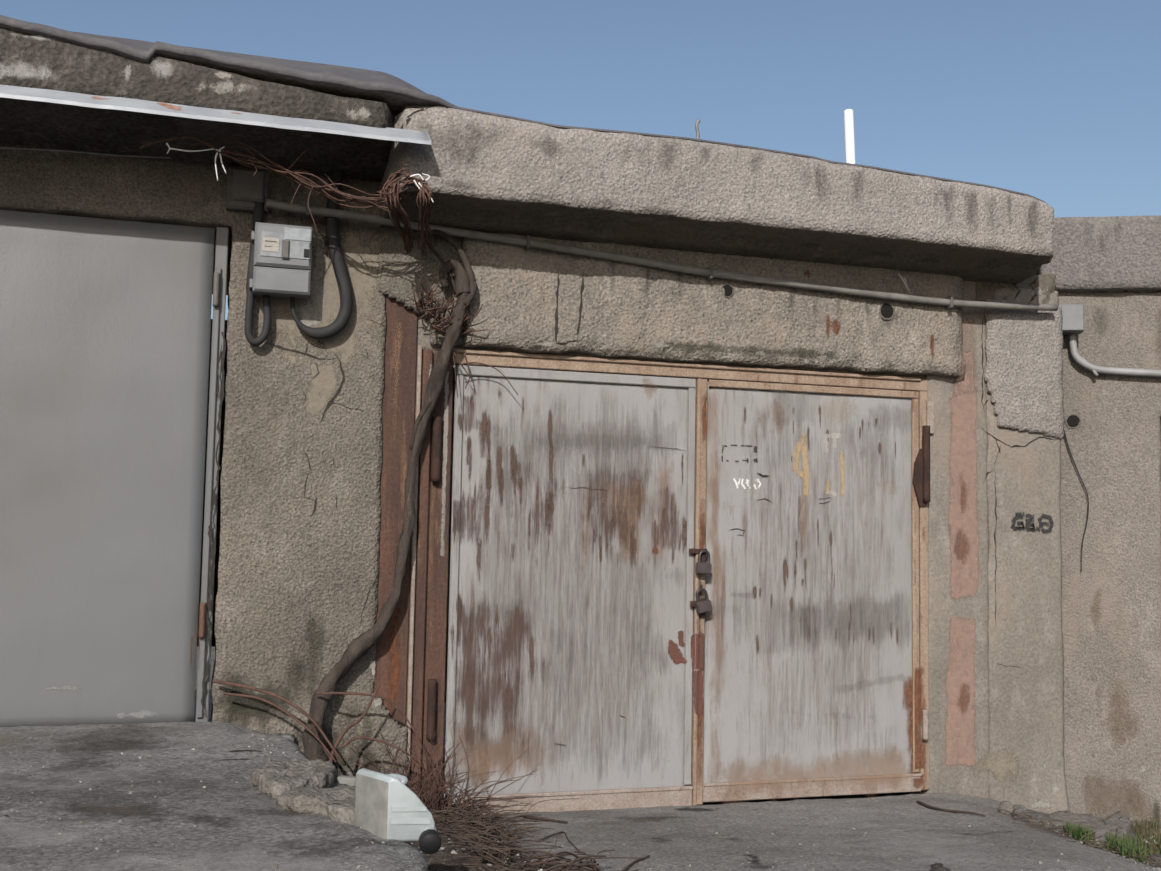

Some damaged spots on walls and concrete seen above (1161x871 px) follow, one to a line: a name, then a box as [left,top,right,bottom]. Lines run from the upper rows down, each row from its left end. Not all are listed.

crack [554,274,585,345]
spalling [975,273,1056,304]
crack [266,338,368,422]
corrosion [458,411,564,579]
corrosion [582,455,641,564]
corrosion [652,487,705,561]
corrosion [783,504,817,639]
leakage [229,619,321,724]
corrosion [451,596,462,655]
corrosion [903,669,925,787]